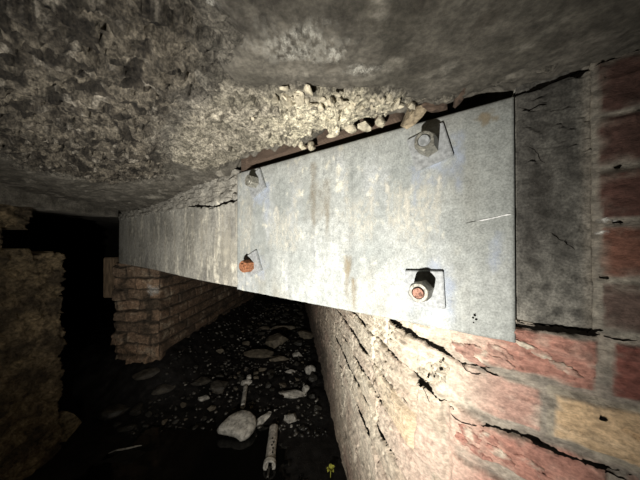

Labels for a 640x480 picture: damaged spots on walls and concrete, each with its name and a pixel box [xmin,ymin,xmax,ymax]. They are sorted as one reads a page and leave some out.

spalling [0,0,455,185]
crack [189,199,237,209]
crack [335,310,394,455]
crack [390,319,500,377]
crack [414,371,632,480]
crack [515,322,637,341]